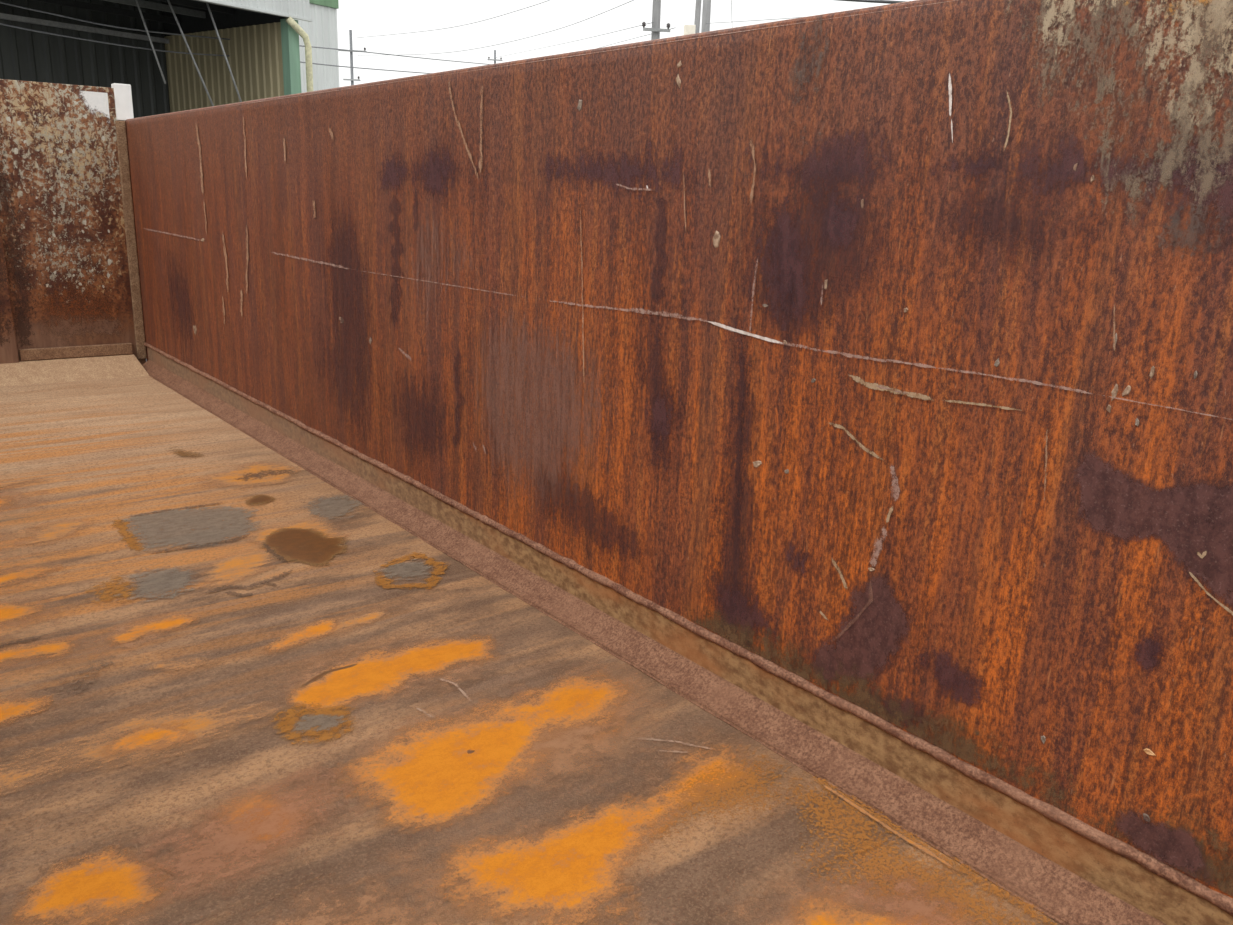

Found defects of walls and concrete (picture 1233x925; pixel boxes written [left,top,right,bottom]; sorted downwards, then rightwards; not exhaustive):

rust [0,127,35,347]
rust [544,141,695,302]
rust [1011,132,1233,232]
leakage [87,494,364,605]
rust [0,609,502,795]
rust [201,516,348,587]
rust [812,573,911,683]
leakage [689,609,1076,815]
rust [1074,450,1233,610]
rust [9,664,1057,925]
rust [1117,811,1208,882]
leakage [1160,817,1233,897]